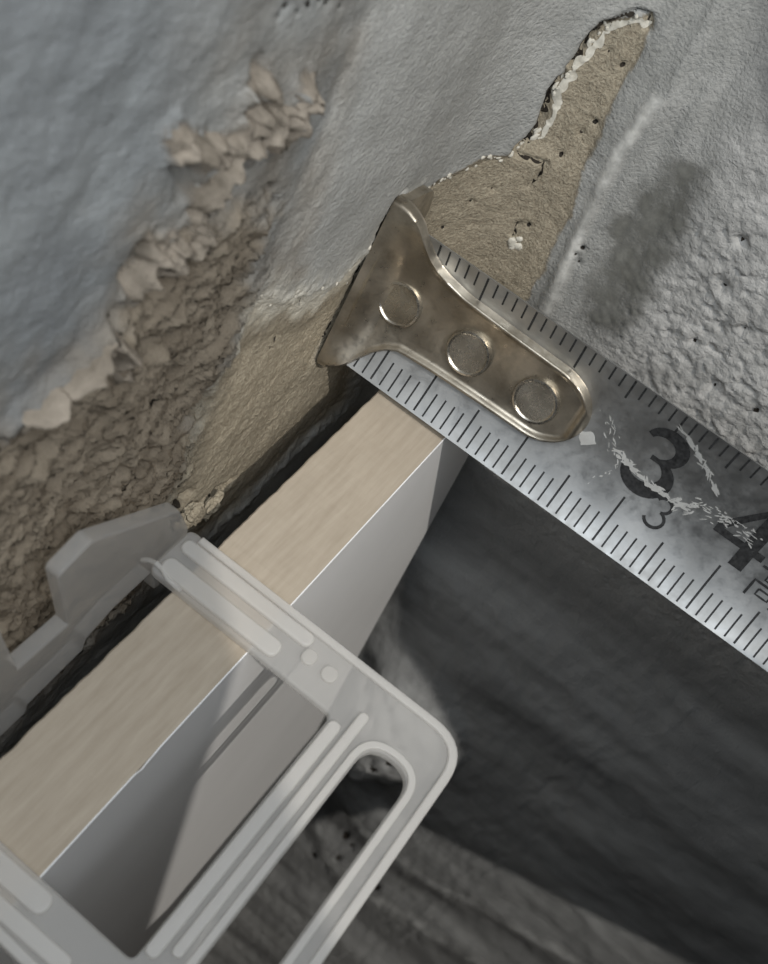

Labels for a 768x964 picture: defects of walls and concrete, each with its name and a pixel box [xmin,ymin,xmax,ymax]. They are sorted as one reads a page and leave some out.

flaking render [424,12,654,301]
flaking render [18,330,144,434]
flaking render [175,269,357,533]